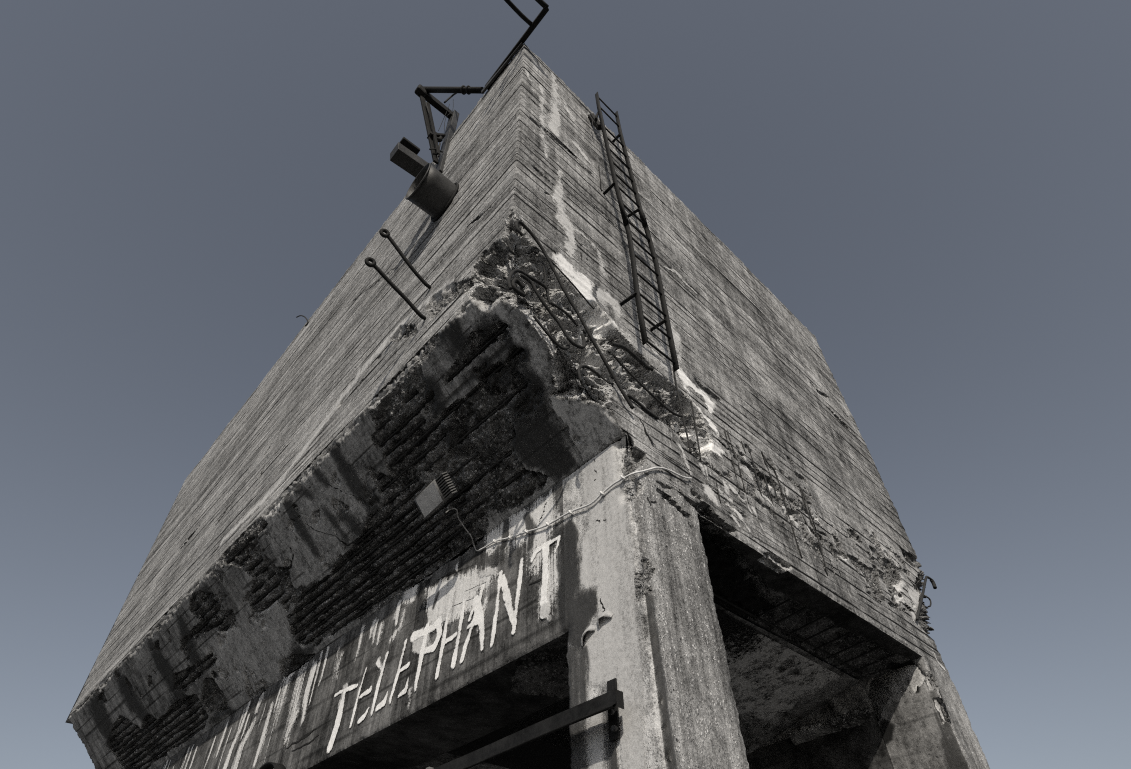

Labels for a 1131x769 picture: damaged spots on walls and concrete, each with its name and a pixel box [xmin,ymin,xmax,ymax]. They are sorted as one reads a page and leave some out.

water stain [525,69,590,163]
water stain [529,170,630,392]
spalling [100,209,937,769]